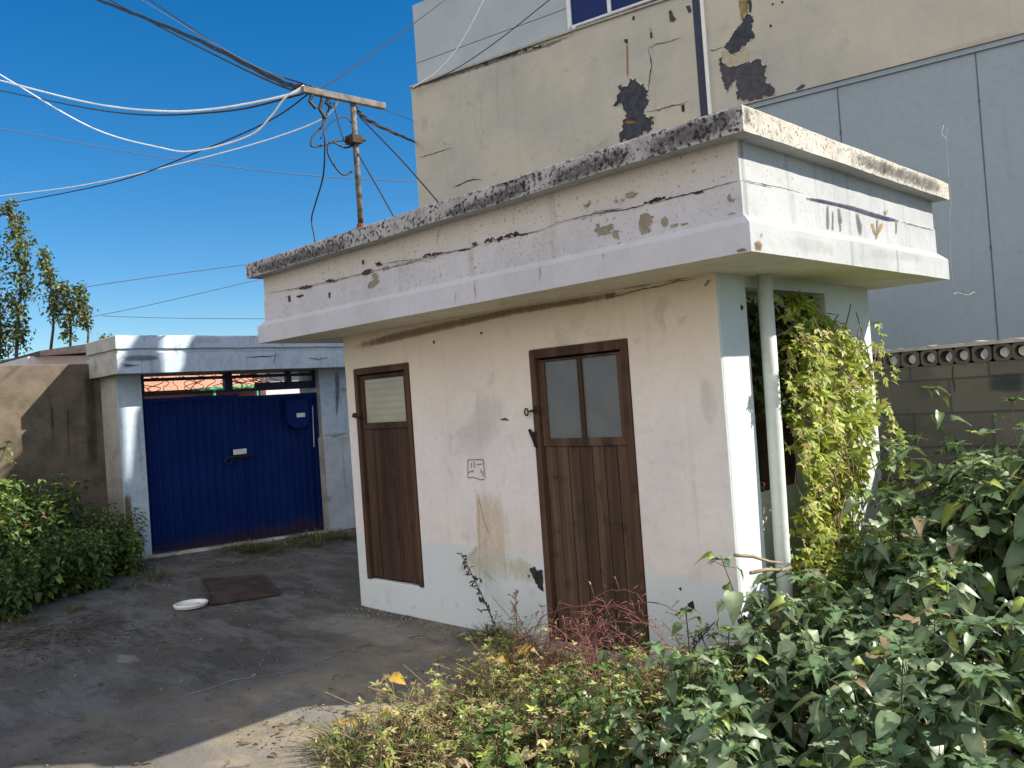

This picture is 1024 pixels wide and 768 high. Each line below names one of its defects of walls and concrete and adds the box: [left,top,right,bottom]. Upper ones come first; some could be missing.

peeling [718,0,777,103]
peeling [613,77,655,142]
leakage [652,112,734,154]
leakage [555,151,627,185]
leakage [446,185,524,215]
peeling [594,223,619,239]
peeling [614,191,688,234]
crack [523,179,803,234]
crack [274,232,483,292]
spalling [527,567,544,591]